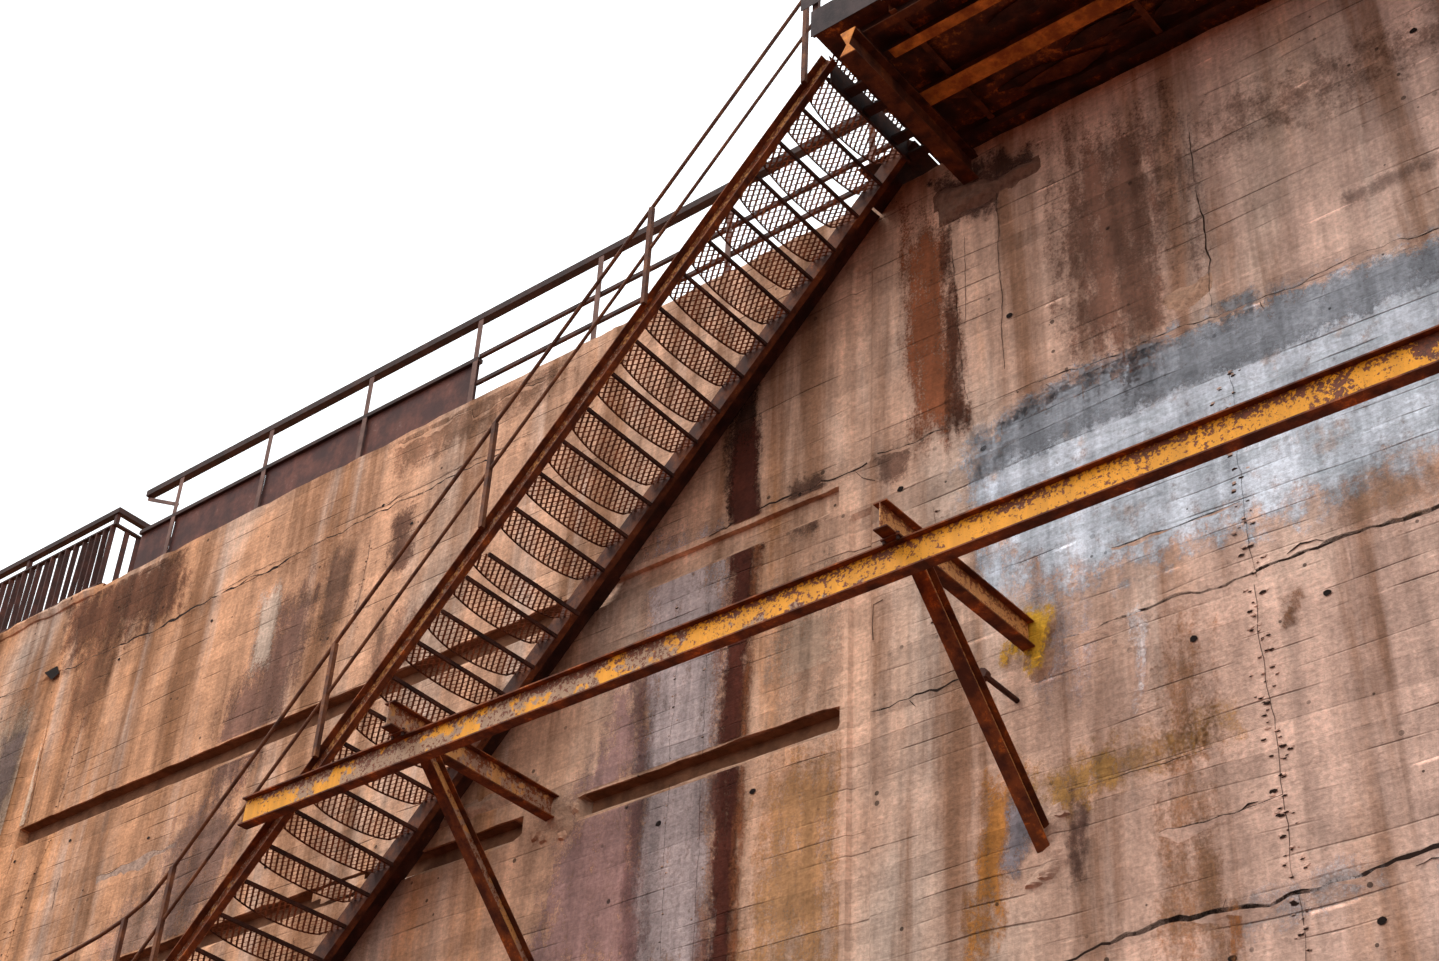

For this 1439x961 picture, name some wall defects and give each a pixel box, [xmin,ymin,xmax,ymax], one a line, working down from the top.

leakage [927,143,1039,223]
leakage [961,81,1439,506]
leakage [646,559,730,637]
leakage [648,384,761,557]
leakage [977,373,1439,691]
crack [1063,502,1439,655]
leakage [0,703,41,835]
leakage [575,649,728,802]
leakage [526,775,717,961]
crack [1066,843,1439,961]